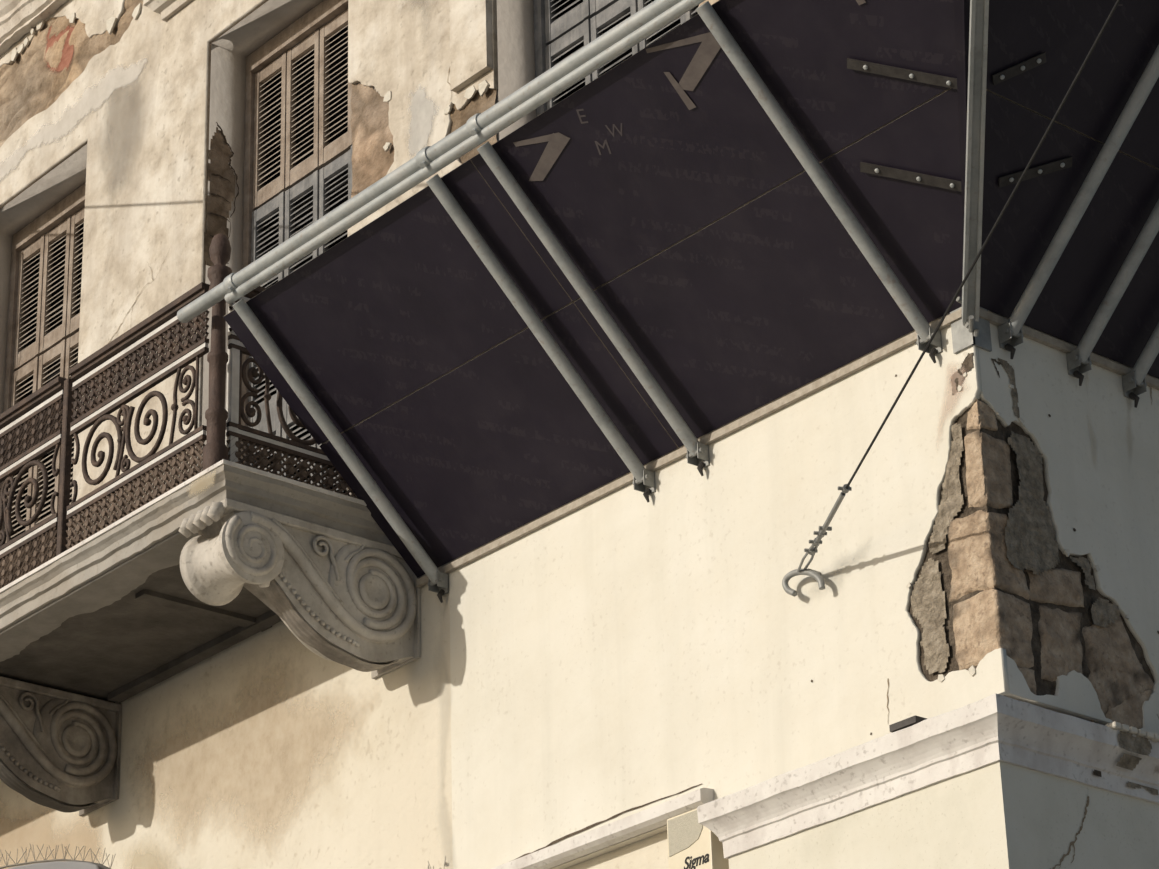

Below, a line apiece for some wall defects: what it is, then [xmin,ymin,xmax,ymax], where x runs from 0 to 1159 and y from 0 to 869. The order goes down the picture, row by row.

spalling [0,0,147,180]
spalling [204,122,239,266]
spalling [350,83,394,198]
spalling [444,80,496,133]
spalling [460,135,497,163]
spalling [906,352,1159,795]
crack [1050,796,1089,869]